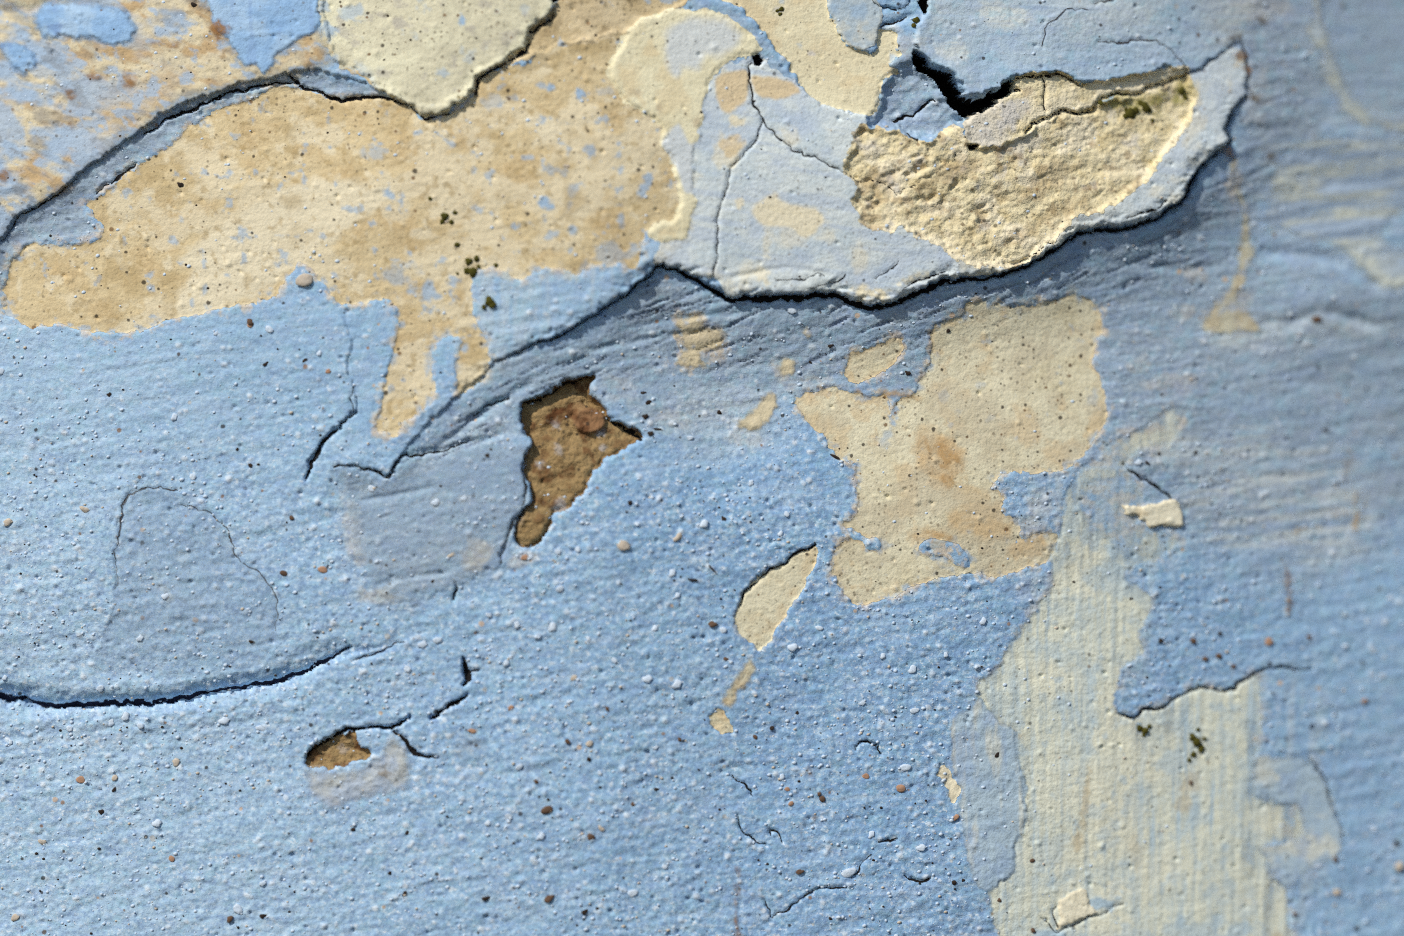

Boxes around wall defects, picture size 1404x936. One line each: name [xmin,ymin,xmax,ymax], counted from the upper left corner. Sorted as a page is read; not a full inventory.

crack [1,15,554,241]
peeling [0,0,1011,437]
crack [493,0,1254,362]
crack [305,377,591,564]
spalling [514,375,643,547]
crack [609,420,642,441]
crack [1123,463,1171,499]
crack [0,641,405,709]
spalling [305,731,407,806]
peeling [709,293,1342,936]
crack [1120,666,1313,719]
crack [1309,756,1344,838]